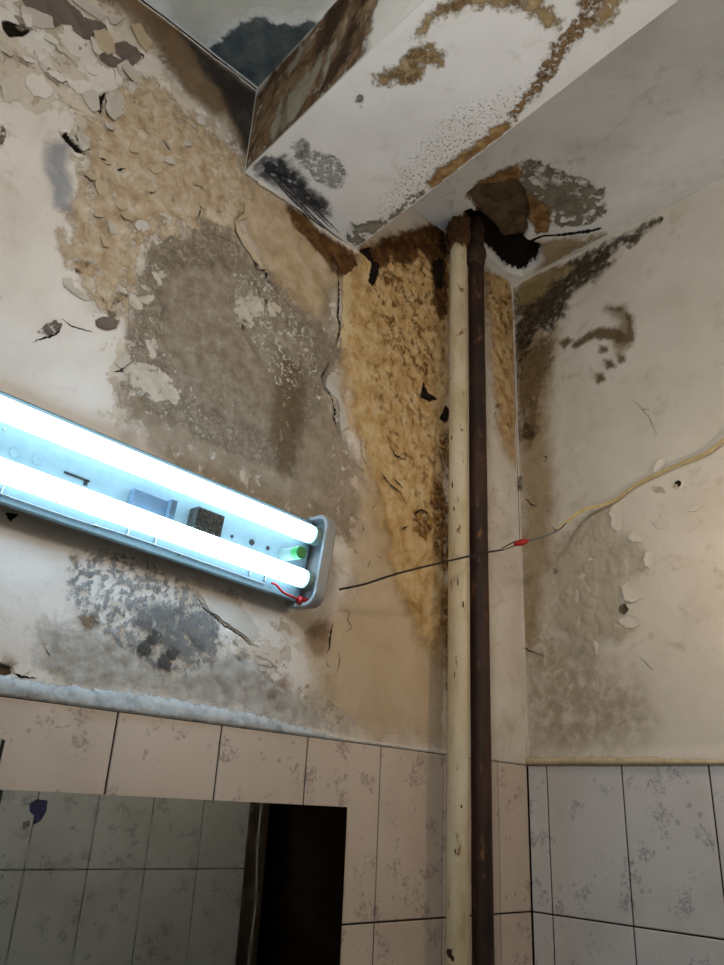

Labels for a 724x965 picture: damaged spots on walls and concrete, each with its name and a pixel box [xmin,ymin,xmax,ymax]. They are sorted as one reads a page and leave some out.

flaking render [0,0,357,534]
spalling [465,164,603,269]
leakage [110,0,622,740]
leakage [485,217,664,643]
peeling [0,620,36,679]
leakage [67,554,223,673]
peeling [41,621,341,728]